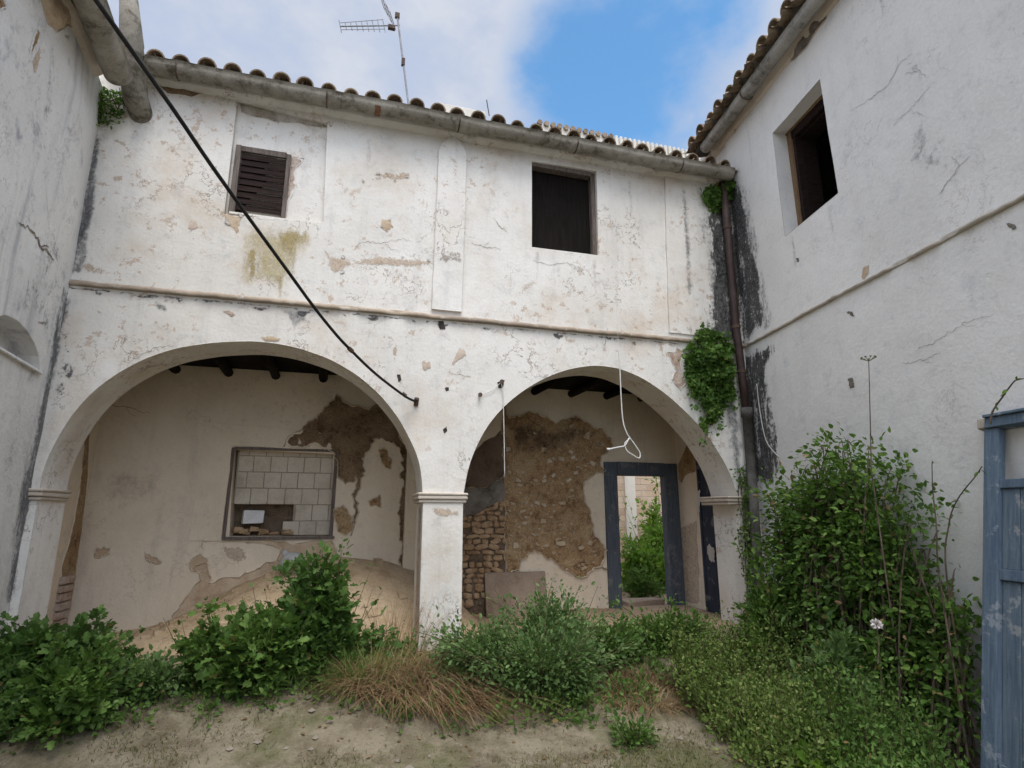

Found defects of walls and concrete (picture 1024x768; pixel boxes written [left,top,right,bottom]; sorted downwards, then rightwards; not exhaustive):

crack [856,54,933,122]
damp [74,139,102,273]
peeling [362,172,409,182]
crack [19,222,54,260]
damp [249,232,305,281]
peeling [328,251,461,274]
damp [702,178,763,339]
spalling [668,348,687,391]
damp [745,345,778,484]
spalling [171,393,407,620]
spalling [462,405,614,617]